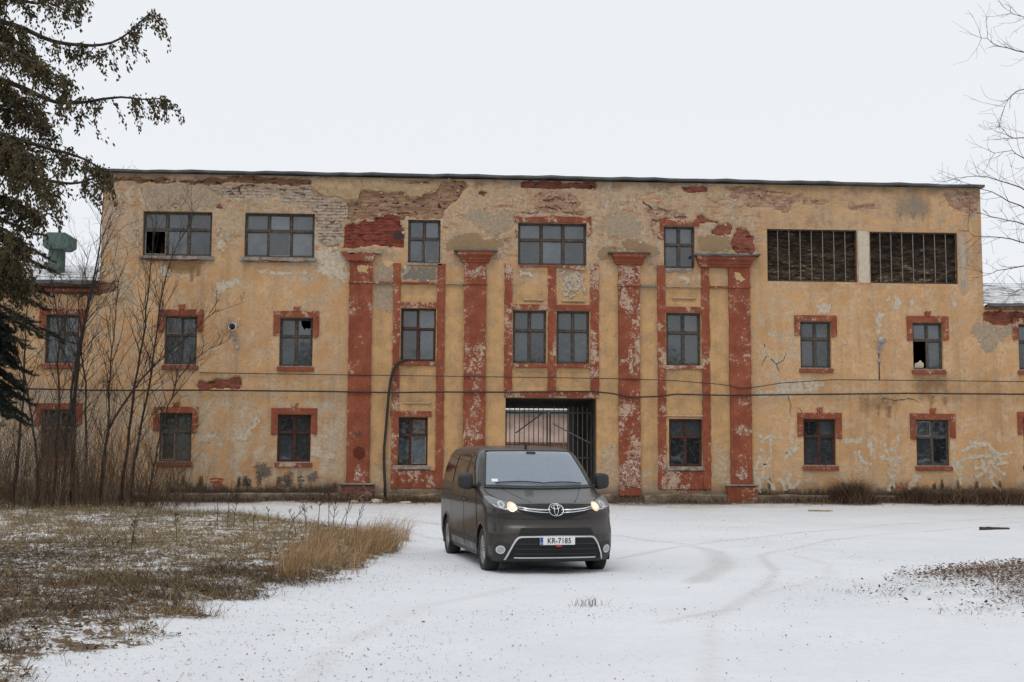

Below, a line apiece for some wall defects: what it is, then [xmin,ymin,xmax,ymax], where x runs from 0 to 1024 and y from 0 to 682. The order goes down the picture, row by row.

spalling [112,175,466,282]